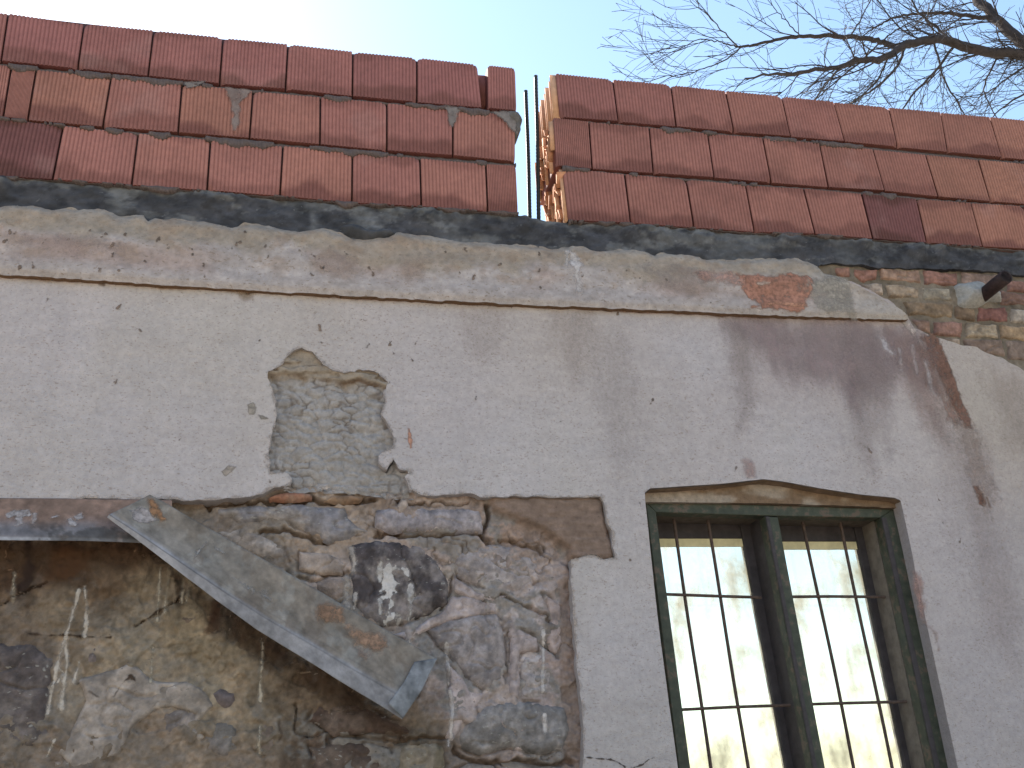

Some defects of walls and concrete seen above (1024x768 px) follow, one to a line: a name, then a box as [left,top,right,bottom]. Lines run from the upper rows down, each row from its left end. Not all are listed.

flaking render [698,265,1024,371]
rust [917,333,972,433]
flaking render [0,347,614,768]